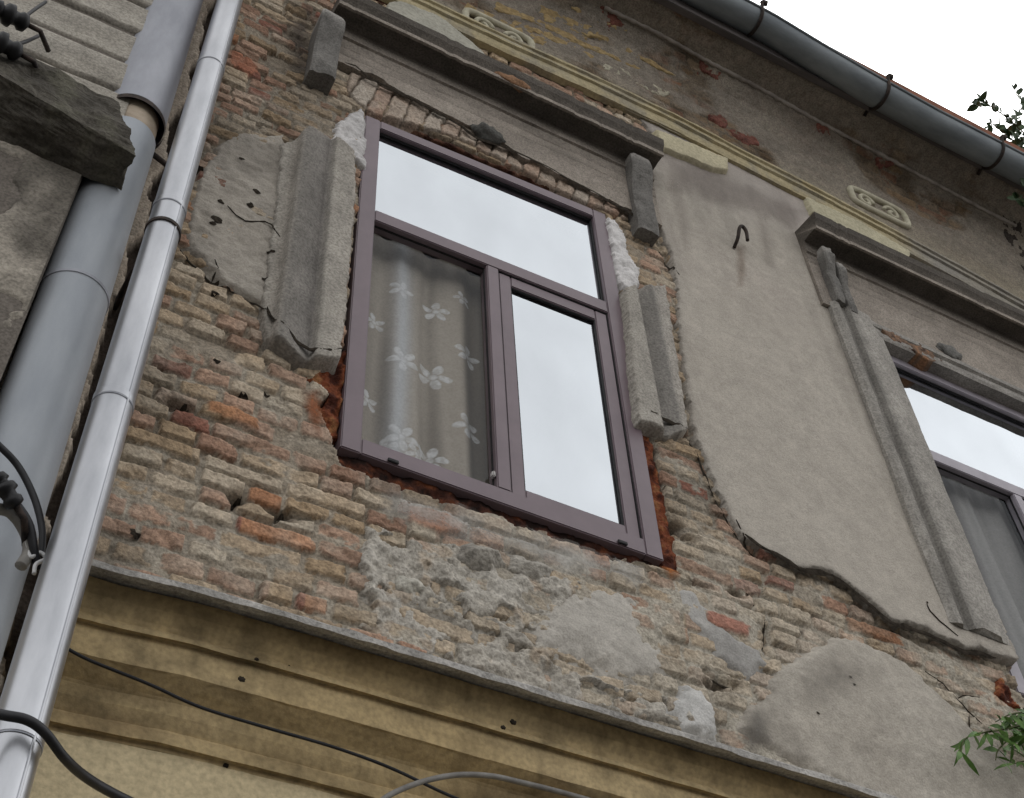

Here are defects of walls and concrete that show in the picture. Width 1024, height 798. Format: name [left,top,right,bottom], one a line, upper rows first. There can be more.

peeling [464,2,676,96]
spalling [708,114,759,146]
crack [228,206,280,237]
crack [180,249,343,352]
crack [651,410,996,659]
spalling [357,526,695,726]